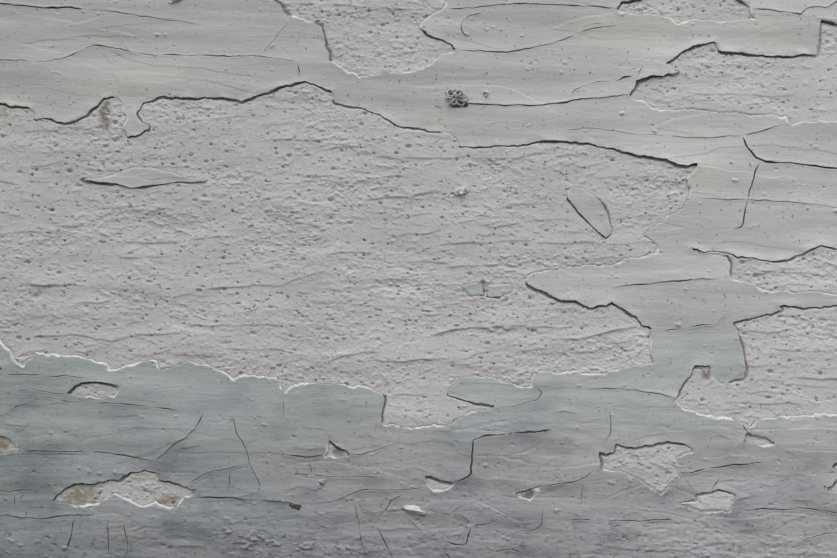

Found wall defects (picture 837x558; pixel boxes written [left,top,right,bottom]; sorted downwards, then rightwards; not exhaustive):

crack [0,0,200,27]
crack [0,42,302,78]
peeling [272,0,459,79]
crack [446,0,619,56]
crack [467,63,646,109]
peeling [627,17,837,126]
crack [562,121,837,232]
peeling [0,78,701,430]
peeling [674,242,837,447]
peeling [49,466,201,510]
crack [275,426,675,558]
peeling [595,437,694,496]